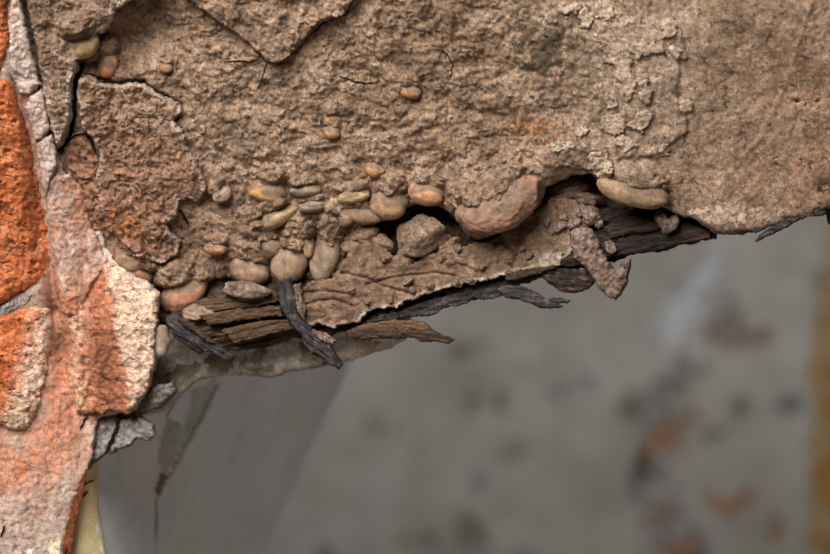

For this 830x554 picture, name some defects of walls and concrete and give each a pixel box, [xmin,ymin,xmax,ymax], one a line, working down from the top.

crack [226,0,354,91]
crack [59,65,181,153]
spalling [334,204,483,273]
spalling [203,278,273,301]